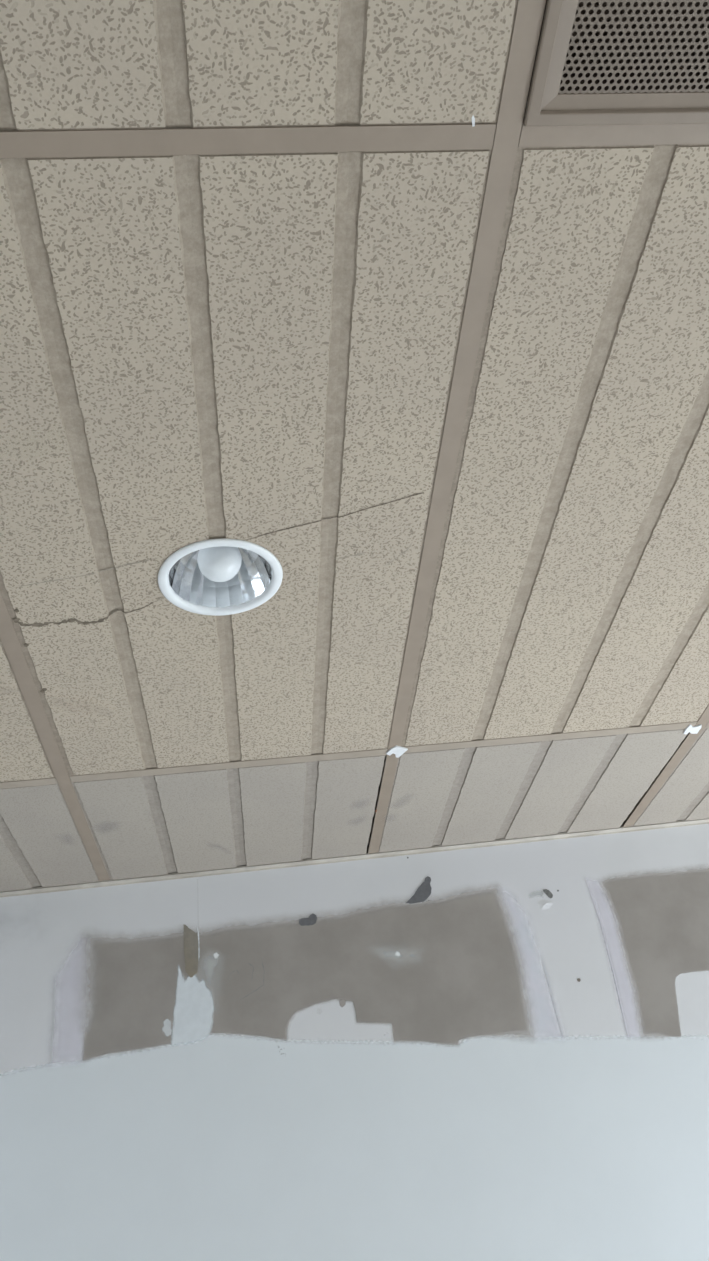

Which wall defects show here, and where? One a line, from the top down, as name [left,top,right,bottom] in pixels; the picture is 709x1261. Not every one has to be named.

crack [246,492,424,540]
crack [14,599,162,627]